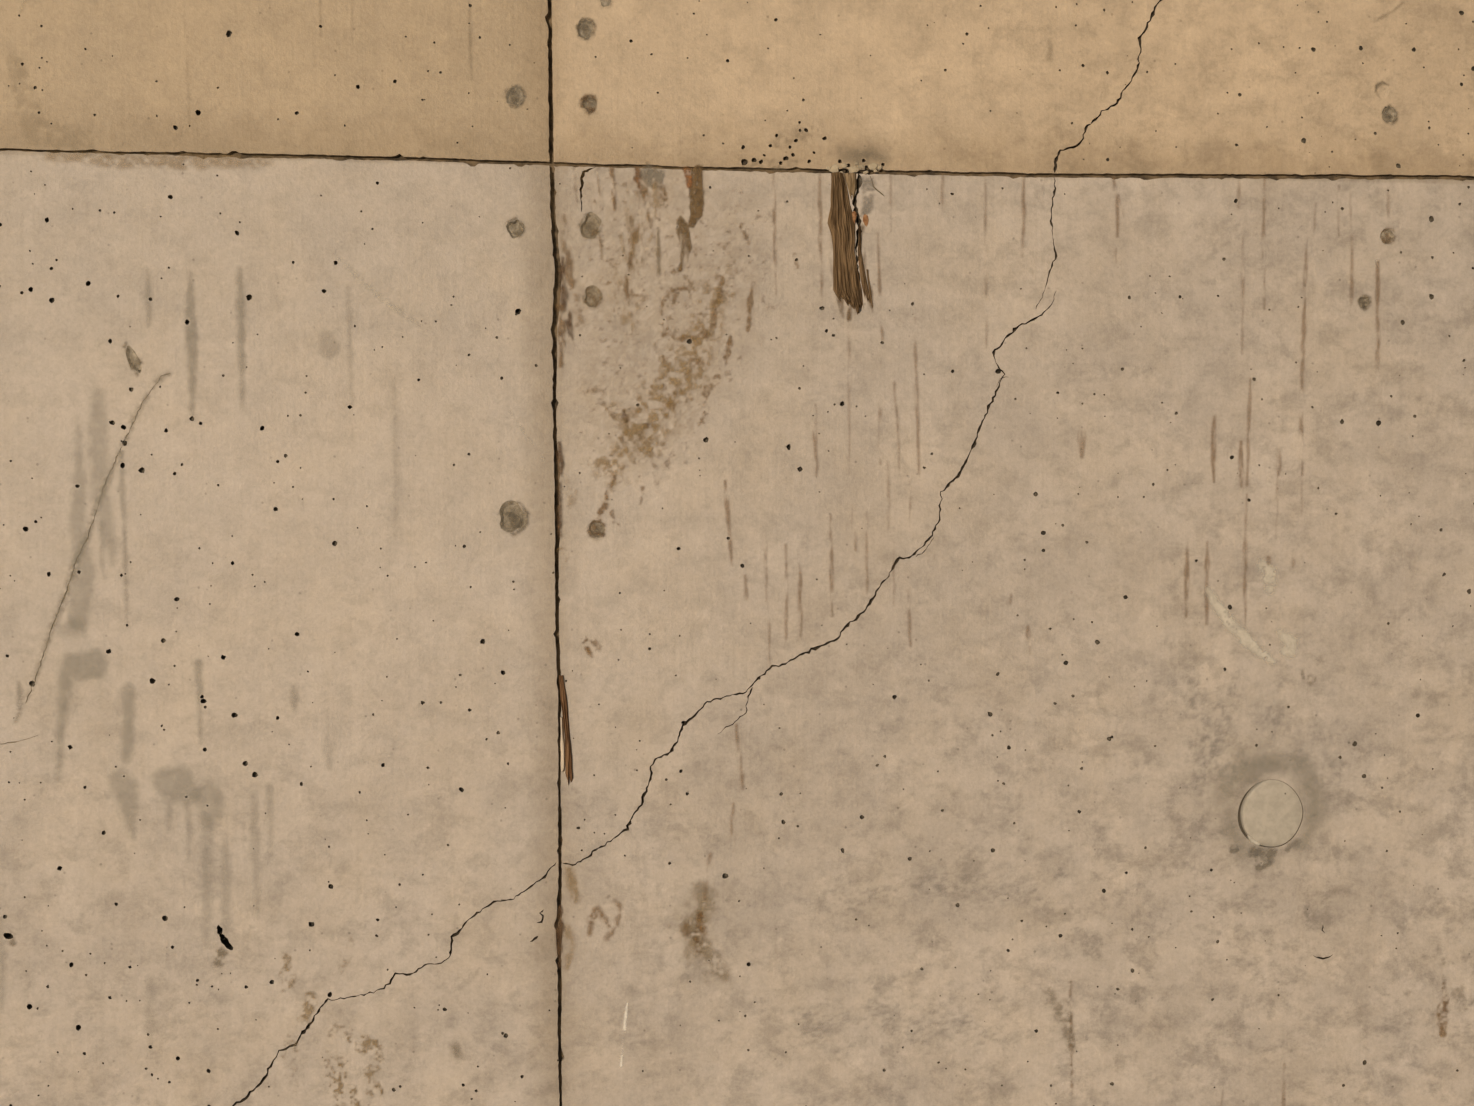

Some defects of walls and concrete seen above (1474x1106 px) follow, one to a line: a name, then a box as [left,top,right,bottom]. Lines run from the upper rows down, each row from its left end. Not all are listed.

corrosion [634,167,666,200]
corrosion [658,165,704,302]
corrosion [597,278,723,522]
crack [232,0,1162,1106]